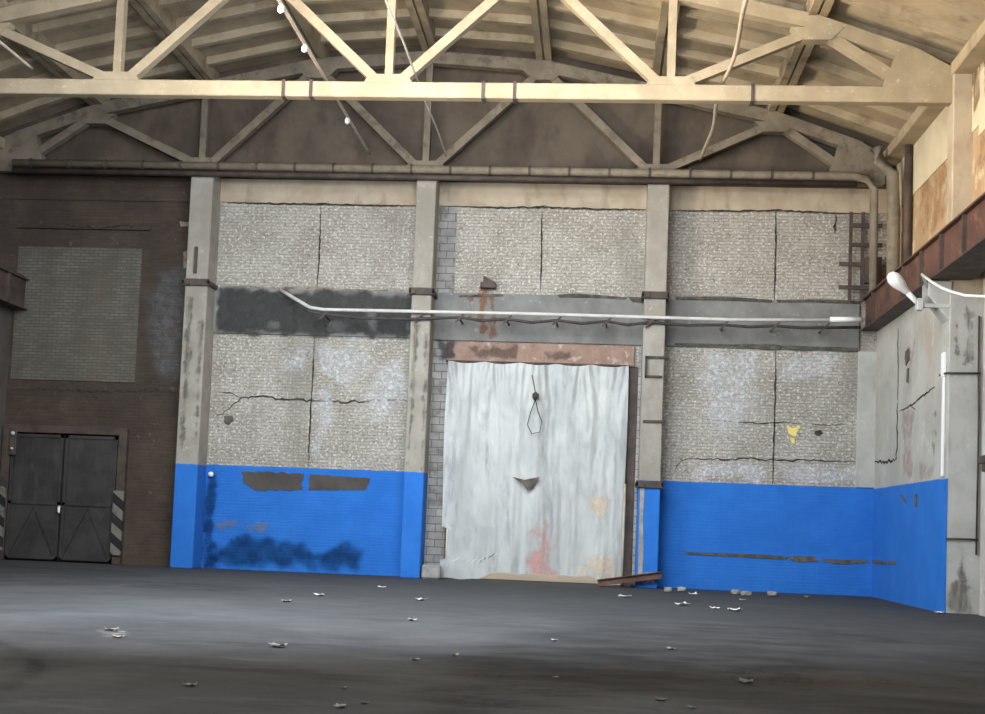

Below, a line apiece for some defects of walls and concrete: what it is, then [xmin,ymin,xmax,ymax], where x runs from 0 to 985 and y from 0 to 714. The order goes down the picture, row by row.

corrosion [469,289,496,336]
crack [216,338,407,467]
crack [675,342,936,483]
peeling [242,471,370,491]
peeling [685,552,895,565]